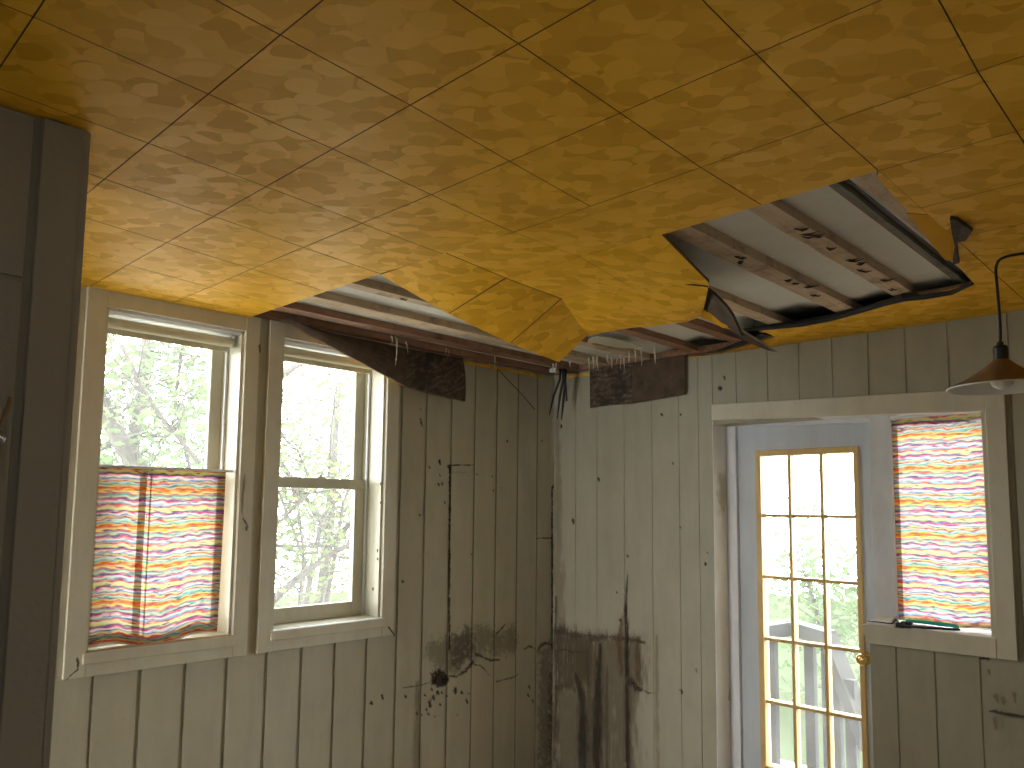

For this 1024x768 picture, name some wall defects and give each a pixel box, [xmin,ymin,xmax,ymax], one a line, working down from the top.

peeling [906,213,973,265]
peeling [587,336,656,370]
water stain [404,653,516,717]
water stain [524,574,650,768]